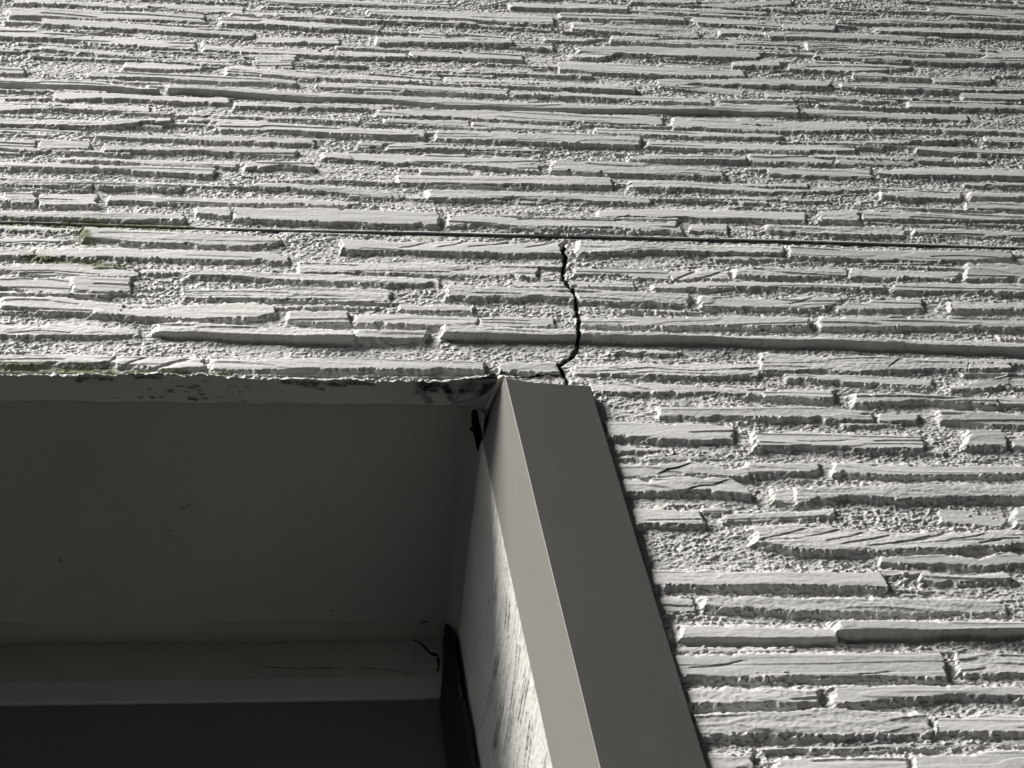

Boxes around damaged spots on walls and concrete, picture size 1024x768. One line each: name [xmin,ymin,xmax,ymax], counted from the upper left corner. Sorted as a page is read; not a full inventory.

crack [500,245,581,385]
crack [469,409,482,451]
crack [413,621,440,673]